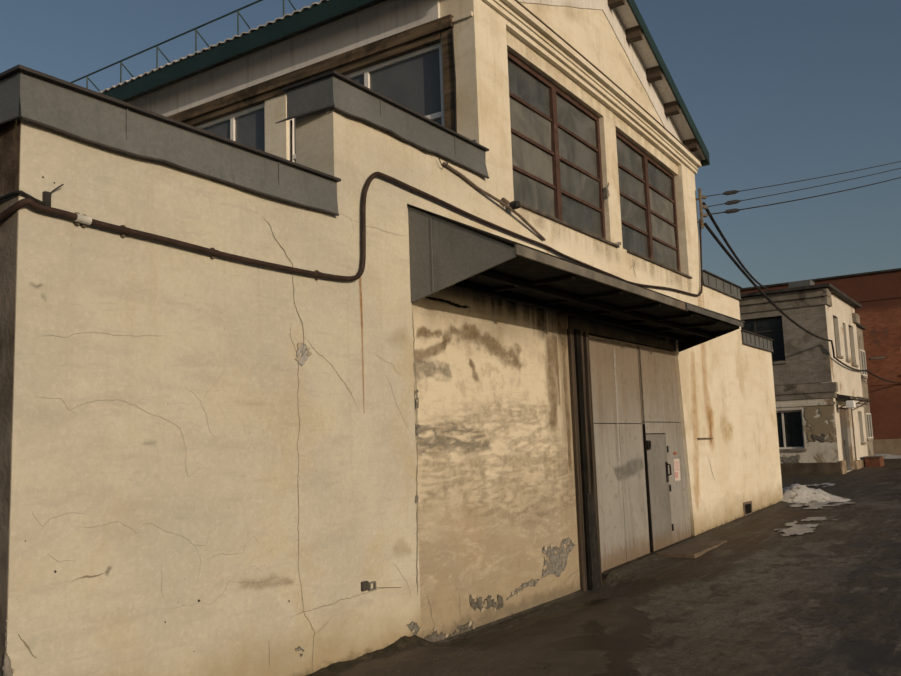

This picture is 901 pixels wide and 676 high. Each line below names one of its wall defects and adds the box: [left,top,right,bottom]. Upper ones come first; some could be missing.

spalling [296,342,312,366]
crack [268,223,355,473]
damp [413,325,520,376]
crack [378,297,471,624]
damp [548,332,571,467]
spalling [804,405,836,443]
crack [36,496,381,673]
spalling [469,537,575,612]
spalling [2,620,15,676]
spalling [407,621,475,642]